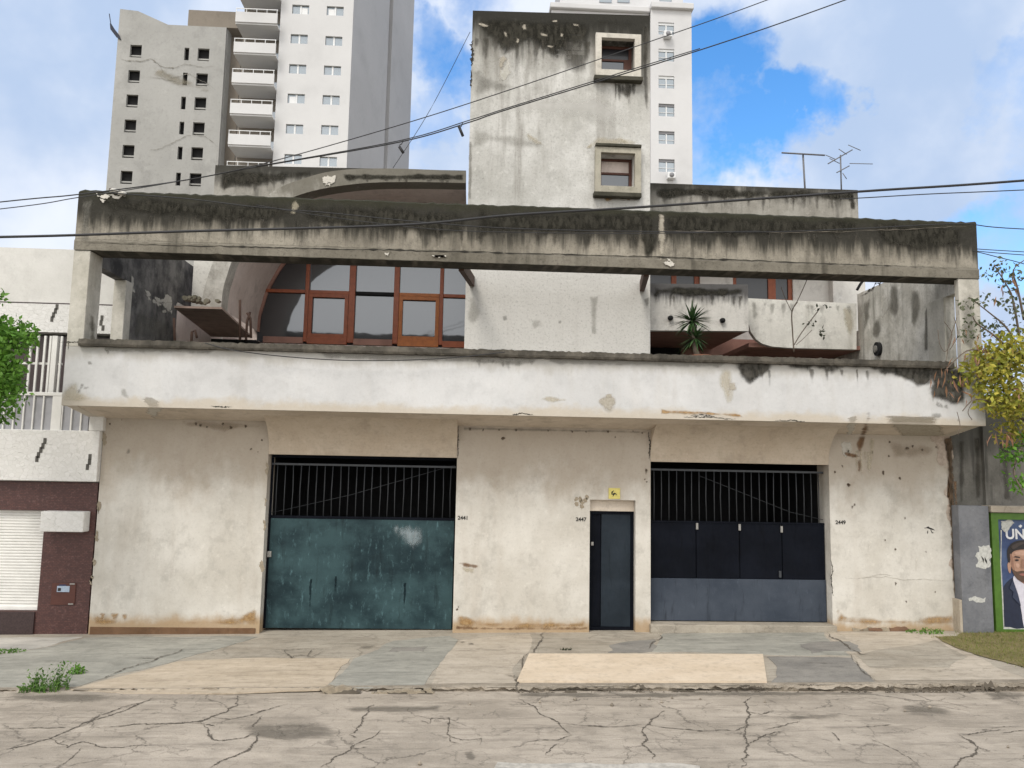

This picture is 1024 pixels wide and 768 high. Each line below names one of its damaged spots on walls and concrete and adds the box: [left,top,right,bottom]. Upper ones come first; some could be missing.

water stain [482,21,589,66]
crack [123,58,209,85]
water stain [615,28,647,100]
water stain [104,199,283,224]
water stain [657,189,855,209]
water stain [479,212,855,259]
water stain [877,224,961,249]
water stain [730,363,771,390]
water stain [872,367,964,403]
corrosion [846,416,867,470]
water stain [225,611,255,624]
crack [515,684,768,693]